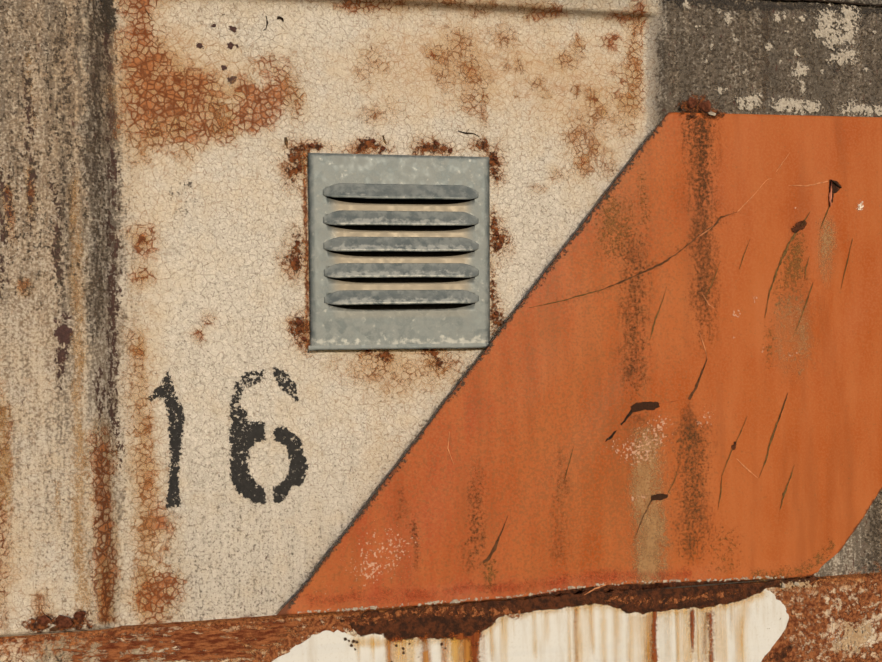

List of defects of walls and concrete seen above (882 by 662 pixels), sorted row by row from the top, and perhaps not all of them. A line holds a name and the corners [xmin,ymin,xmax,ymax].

damp [0,0,119,343]
rust [115,0,304,164]
rust [344,137,394,154]
rust [469,138,505,184]
damp [663,0,882,109]
rust [276,139,332,354]
rust [490,212,513,335]
crack [529,178,772,308]
peeling [289,120,819,613]
crack [605,410,633,442]
rust [0,327,882,662]
crack [635,466,679,537]